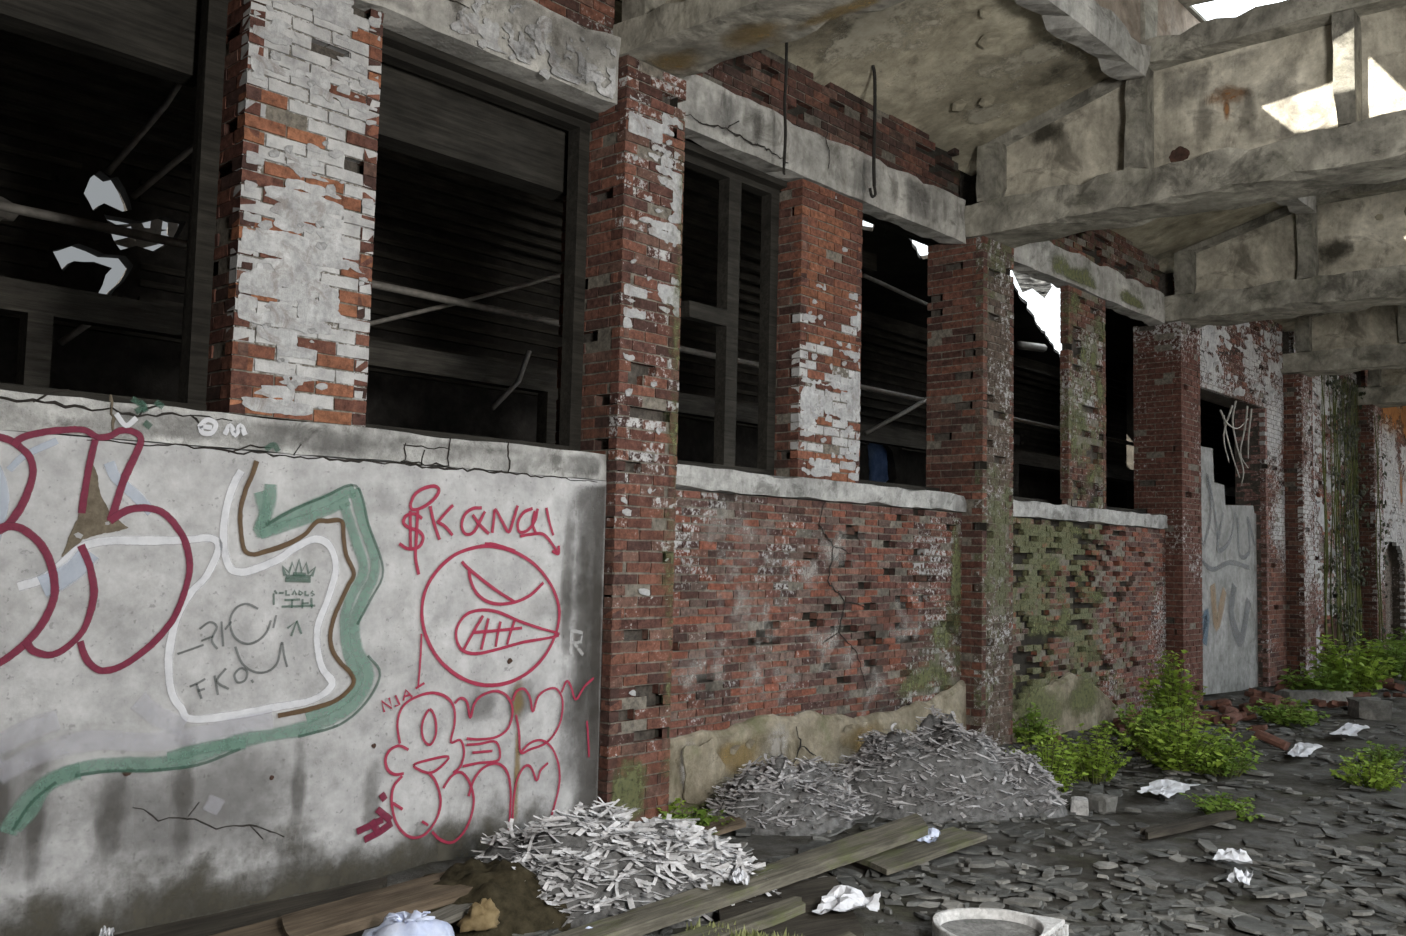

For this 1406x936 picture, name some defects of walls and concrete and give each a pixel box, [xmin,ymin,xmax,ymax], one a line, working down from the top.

peeling [250,0,382,125]
peeling [362,198,374,210]
peeling [238,141,368,416]
peeling [623,259,680,328]
peeling [800,270,861,481]
peeling [1200,321,1283,402]
flaking render [682,739,755,804]
crack [133,802,284,839]
water stain [0,809,536,936]